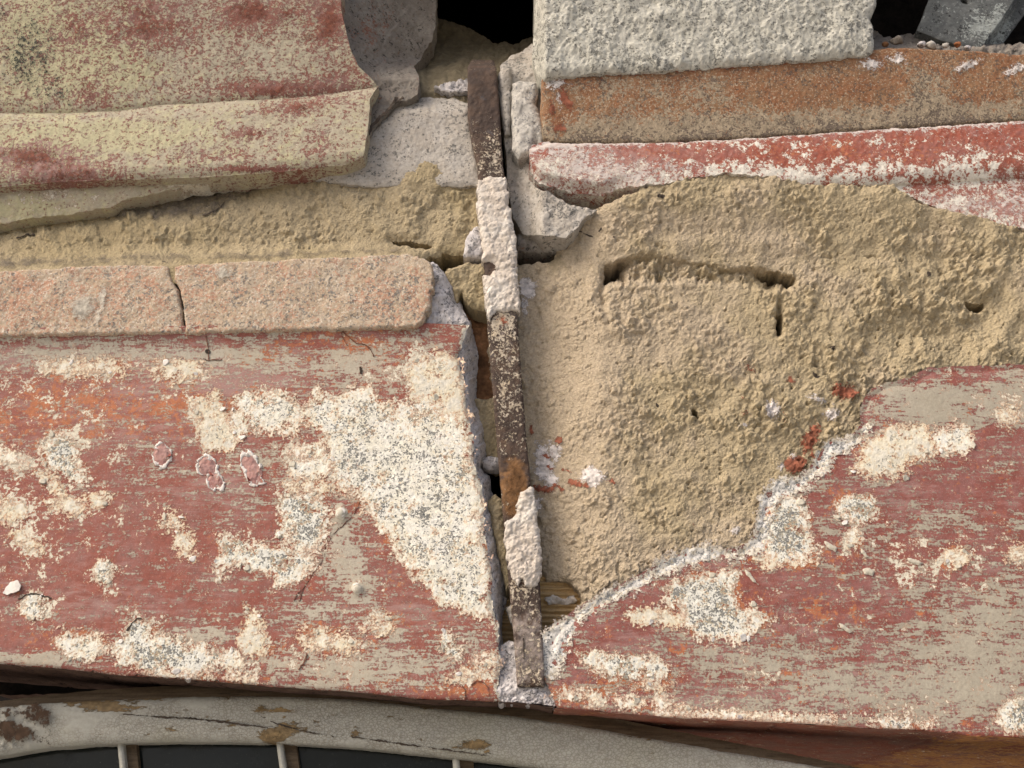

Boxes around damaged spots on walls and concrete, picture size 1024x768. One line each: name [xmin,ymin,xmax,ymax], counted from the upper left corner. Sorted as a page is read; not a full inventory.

spalling [463,226,483,264]
peeling [997,401,1022,432]
peeling [0,426,116,558]
peeling [32,320,513,686]
spalling [540,381,978,725]
peeling [1003,537,1024,570]
peeling [3,580,53,623]
peeling [855,709,936,730]
peeling [986,696,1024,736]